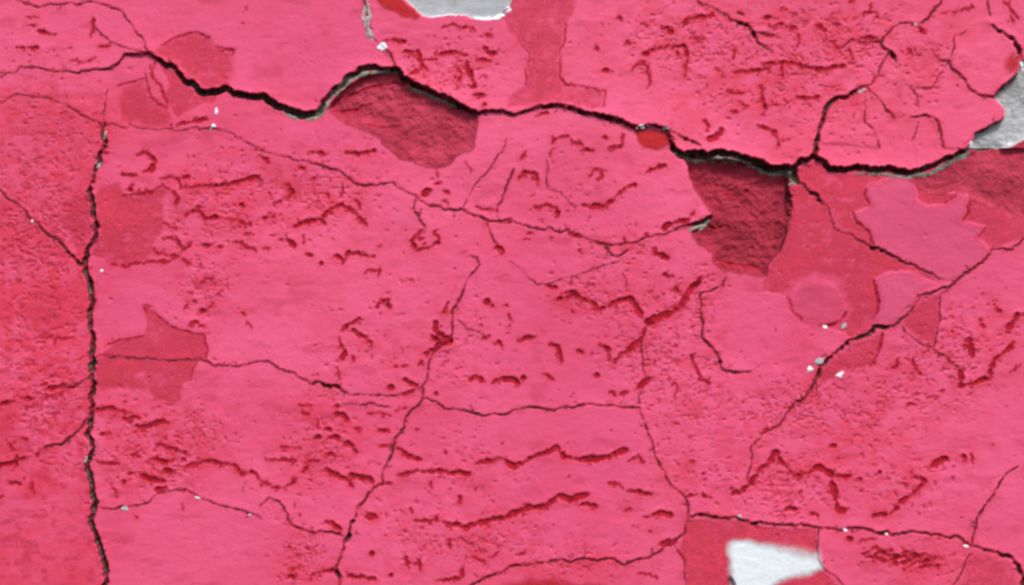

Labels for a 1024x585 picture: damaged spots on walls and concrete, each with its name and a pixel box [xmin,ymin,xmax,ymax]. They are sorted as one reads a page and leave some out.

crack [0,92,292,585]
spalling [328,65,478,169]
spalling [406,0,605,107]
crack [17,0,1021,249]
crack [213,146,1024,585]
peeling [684,60,1024,382]
peeling [677,515,817,585]
peeling [774,569,833,585]